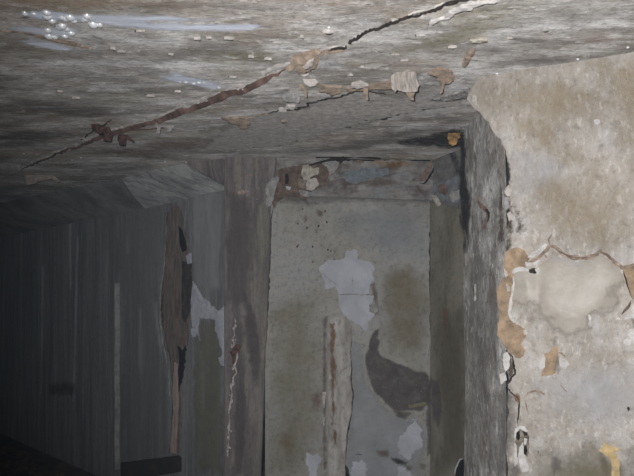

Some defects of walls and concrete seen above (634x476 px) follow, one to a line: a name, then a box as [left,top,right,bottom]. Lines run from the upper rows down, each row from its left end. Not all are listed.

damp [15,10,258,51]
crack [19,0,469,171]
peeling [278,48,419,124]
spalling [236,161,339,215]
spalling [161,204,241,454]
peeling [319,249,378,332]
spalling [490,247,529,359]
crack [227,365,237,456]
peeling [350,419,423,476]
damp [347,330,441,476]
spalling [514,426,529,473]
crack [499,350,545,424]